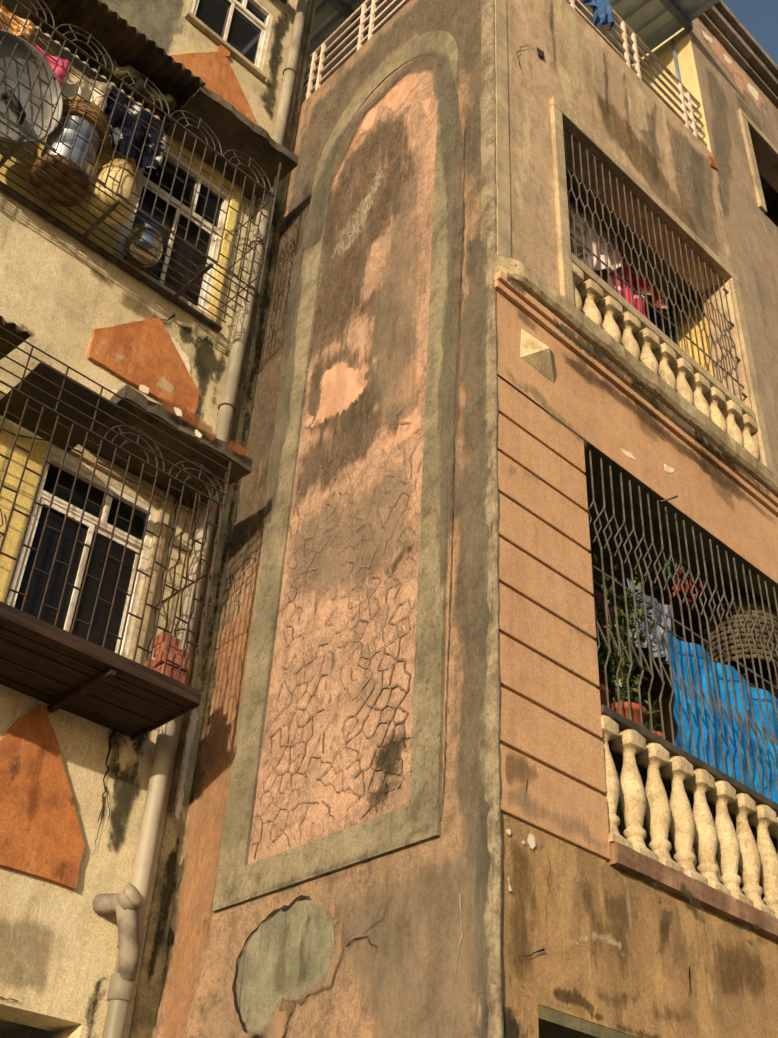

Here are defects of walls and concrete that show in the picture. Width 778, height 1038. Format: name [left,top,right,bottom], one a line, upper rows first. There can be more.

leakage [101,0,182,52]
peeling [701,29,768,114]
crack [457,128,465,327]
leakage [554,319,769,495]
leakage [148,0,493,1038]
crack [250,387,422,859]
crack [440,430,455,820]
crack [93,730,115,854]
leakage [108,731,149,851]
peeling [522,833,536,849]
spalling [232,895,343,1038]
leakage [503,1007,519,1038]